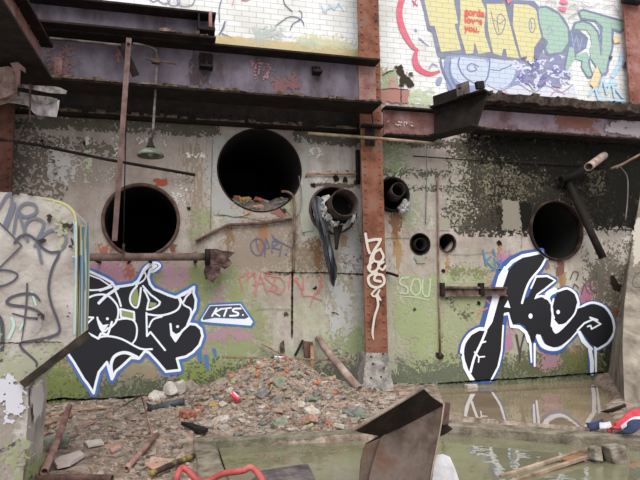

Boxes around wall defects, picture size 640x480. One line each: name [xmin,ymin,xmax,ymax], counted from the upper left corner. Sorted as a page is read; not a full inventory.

corrosion [44,42,252,92]
corrosion [269,72,311,97]
corrosion [481,115,610,136]
peeling [47,136,117,186]
spalling [153,170,194,205]
spalling [519,202,532,230]
corrosion [387,211,405,279]
damp [495,340,613,385]
peeling [0,373,44,424]